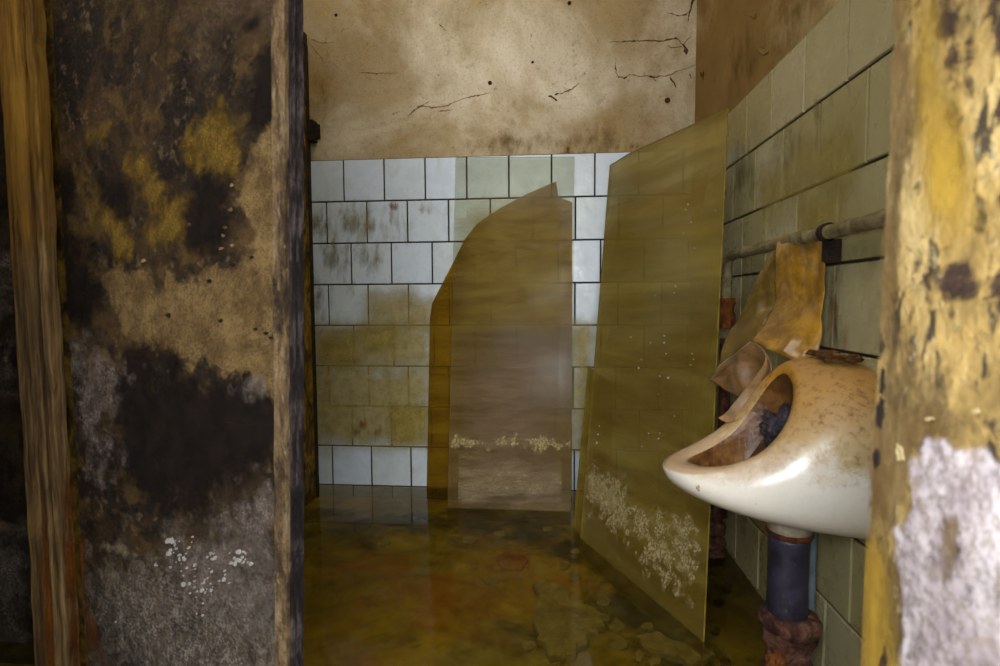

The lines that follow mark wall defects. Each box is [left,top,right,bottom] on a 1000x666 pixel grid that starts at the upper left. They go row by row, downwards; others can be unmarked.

damp [88,97,241,261]
crack [408,92,490,117]
crack [614,0,695,87]
damp [924,1,973,219]
damp [992,97,1000,125]
damp [60,169,274,510]
spalling [872,448,880,469]
spalling [876,367,885,429]
damp [880,201,1000,349]
damp [83,483,275,666]
peeling [893,437,1000,666]
spalling [879,646,887,666]